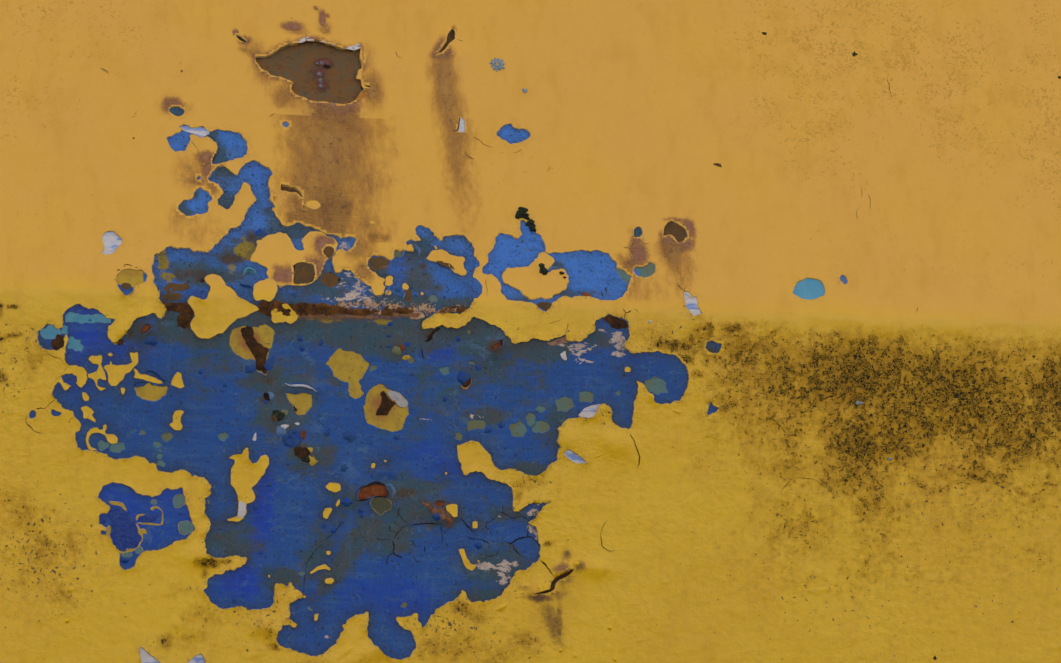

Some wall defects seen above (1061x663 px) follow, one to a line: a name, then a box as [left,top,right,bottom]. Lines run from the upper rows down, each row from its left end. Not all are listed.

spalling [255,37,370,104]
rust [433,39,465,175]
rust [233,7,384,278]
rust [623,238,647,273]
rust [660,218,695,272]
peeling [793,278,825,300]
peeling [26,107,689,660]
mould [644,321,1061,580]
crack [378,504,543,565]
peeling [139,647,159,663]